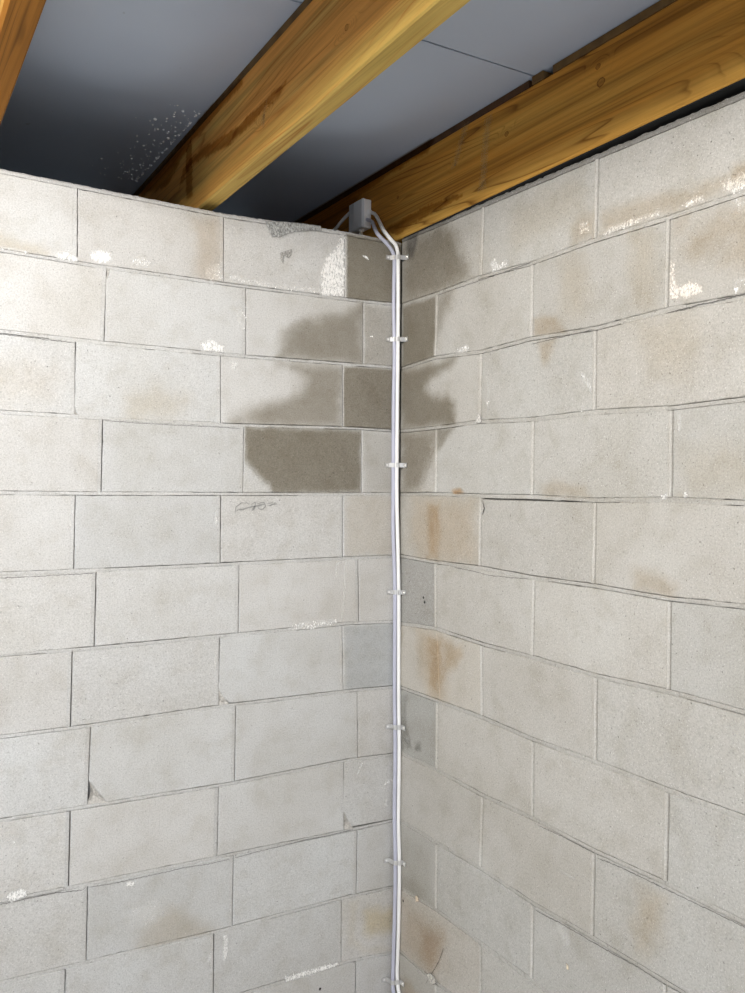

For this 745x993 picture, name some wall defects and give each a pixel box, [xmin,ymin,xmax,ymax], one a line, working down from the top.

leakage [90,250,111,263]
leakage [204,237,346,298]
leakage [201,340,225,353]